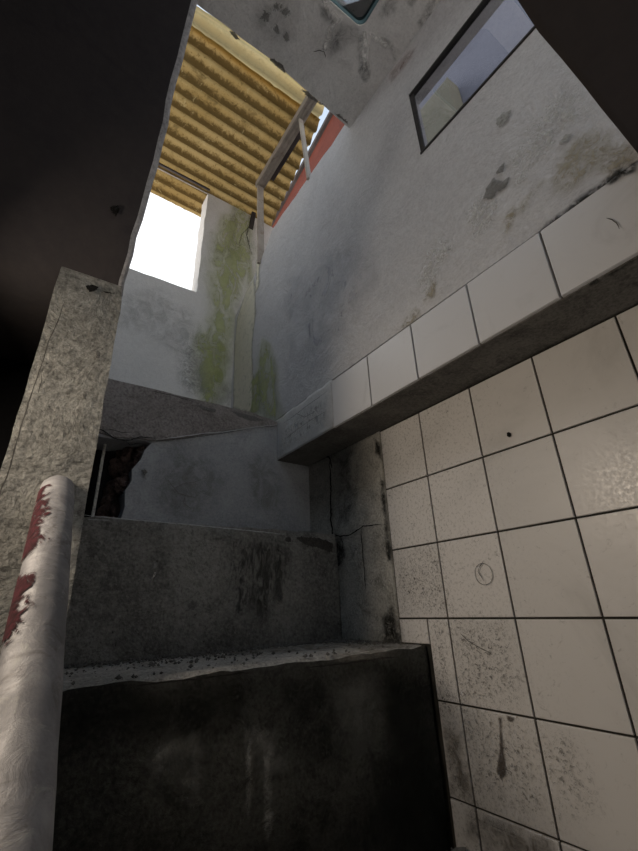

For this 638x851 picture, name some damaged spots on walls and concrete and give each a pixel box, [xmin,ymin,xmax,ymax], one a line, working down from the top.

spalling [84,444,147,521]